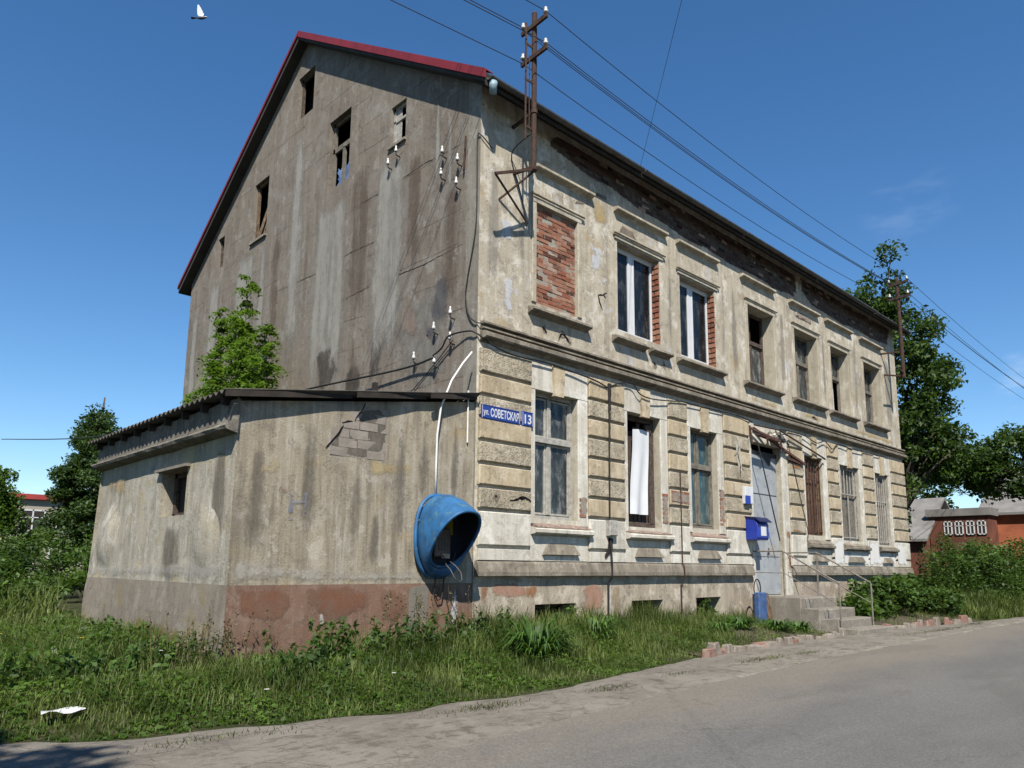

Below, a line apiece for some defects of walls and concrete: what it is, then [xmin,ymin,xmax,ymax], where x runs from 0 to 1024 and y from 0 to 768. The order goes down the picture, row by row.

water stain [187,285,220,396]
water stain [234,249,265,346]
water stain [284,140,304,347]
water stain [309,198,345,386]
water stain [369,160,404,356]
spalling [548,133,889,346]
water stain [212,455,225,520]
water stain [249,454,262,537]
spalling [330,405,388,461]
water stain [236,562,429,580]